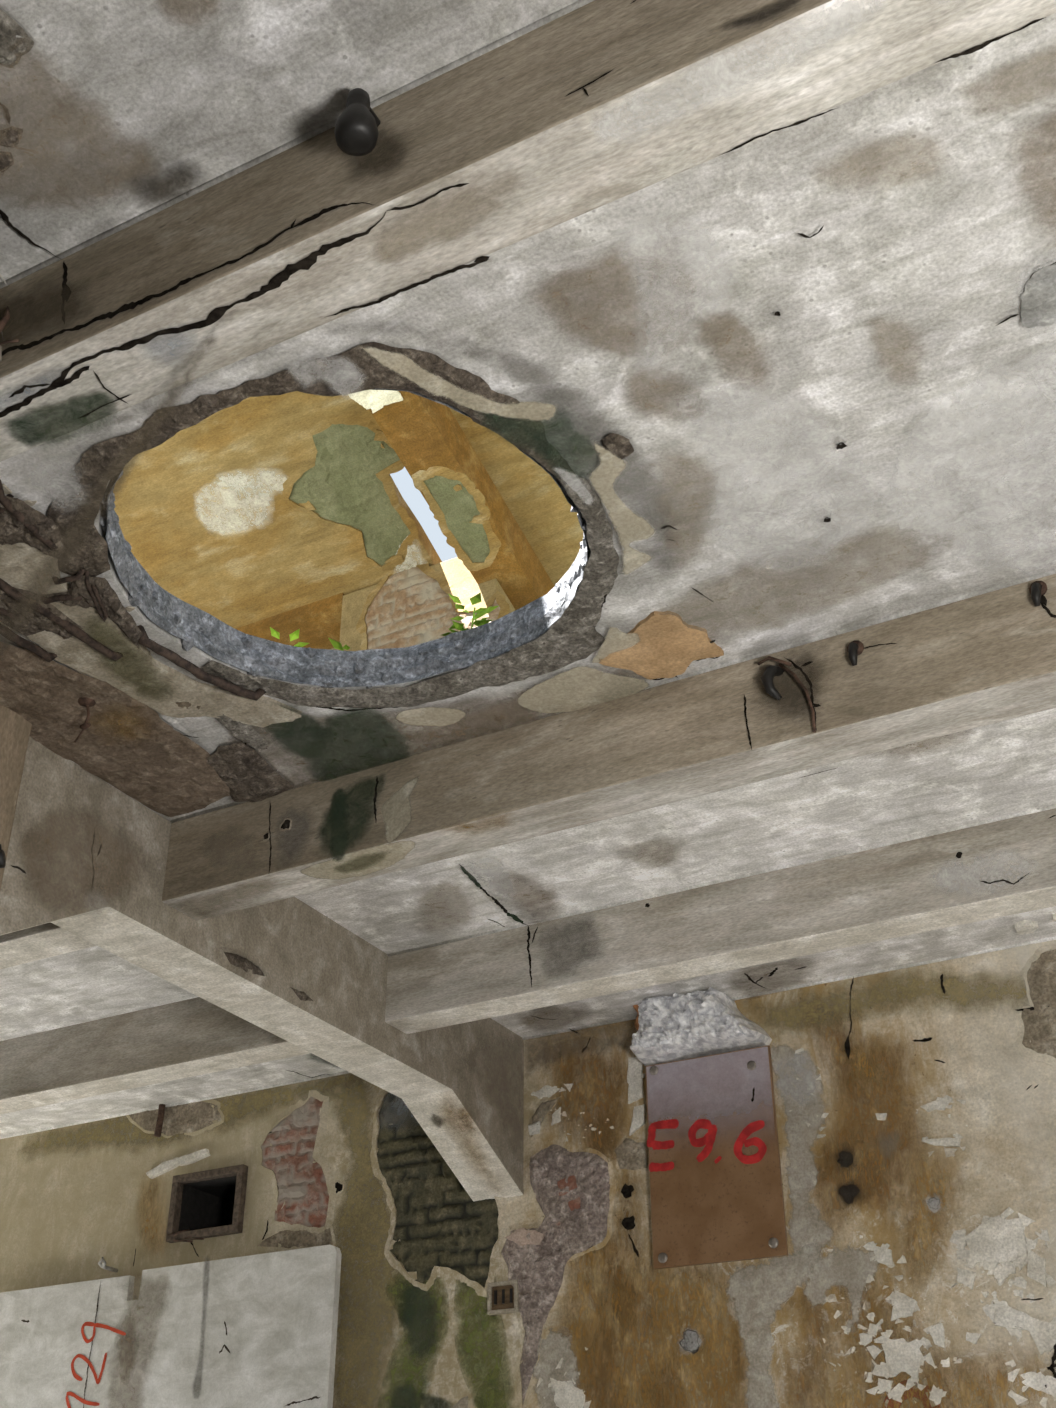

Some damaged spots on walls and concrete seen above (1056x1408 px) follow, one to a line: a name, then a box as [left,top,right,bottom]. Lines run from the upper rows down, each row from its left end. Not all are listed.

crack [0,183,490,418]
leakage [544,232,763,417]
leakage [0,337,214,656]
spalling [0,342,724,817]
leakage [566,380,1056,631]
crack [459,864,590,1052]
flaking render [1014,943,1056,1067]
flaking render [253,1090,345,1252]
flaking render [370,1057,649,1408]
corrosion [816,1014,952,1273]
peeling [822,1235,963,1408]
peeling [950,1207,1056,1408]